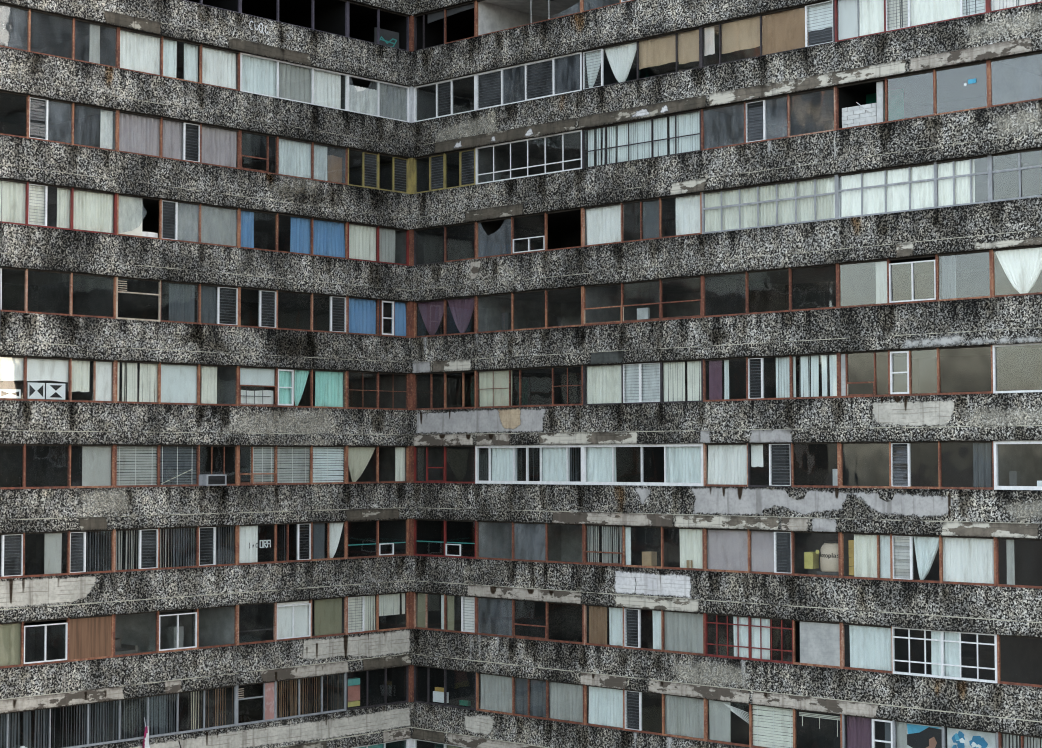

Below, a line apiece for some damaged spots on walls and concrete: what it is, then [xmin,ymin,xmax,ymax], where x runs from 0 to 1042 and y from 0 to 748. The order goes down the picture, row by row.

peeling [632,105,668,117]
spalling [867,397,958,427]
spalling [0,576,97,608]
spalling [611,571,691,606]
spalling [302,629,410,662]